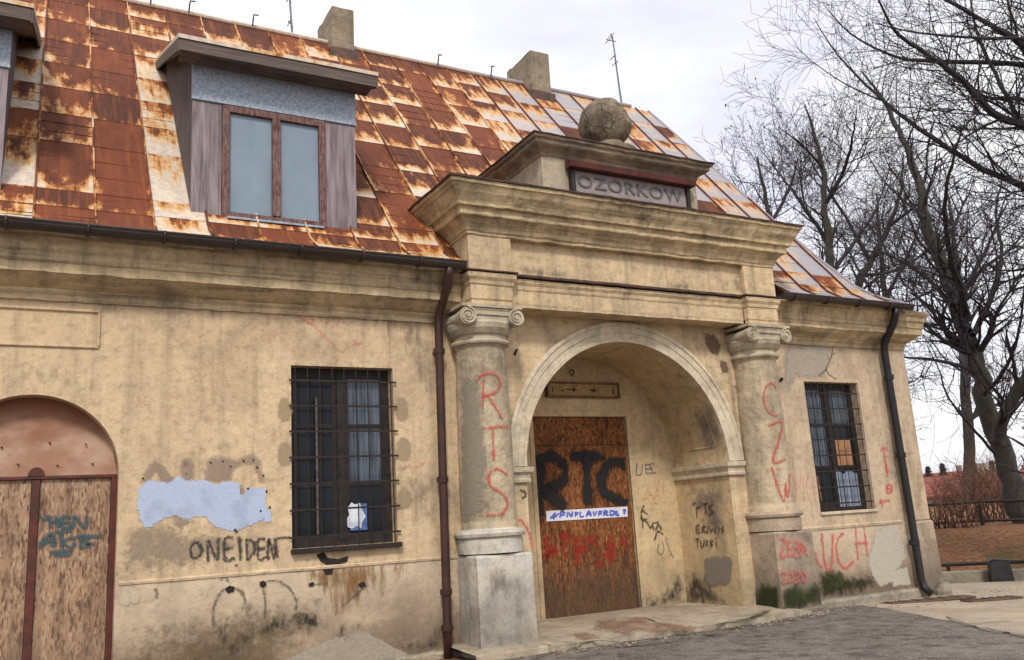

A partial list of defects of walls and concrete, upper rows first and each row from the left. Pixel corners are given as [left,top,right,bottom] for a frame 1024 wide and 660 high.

peeling [137,459,271,531]